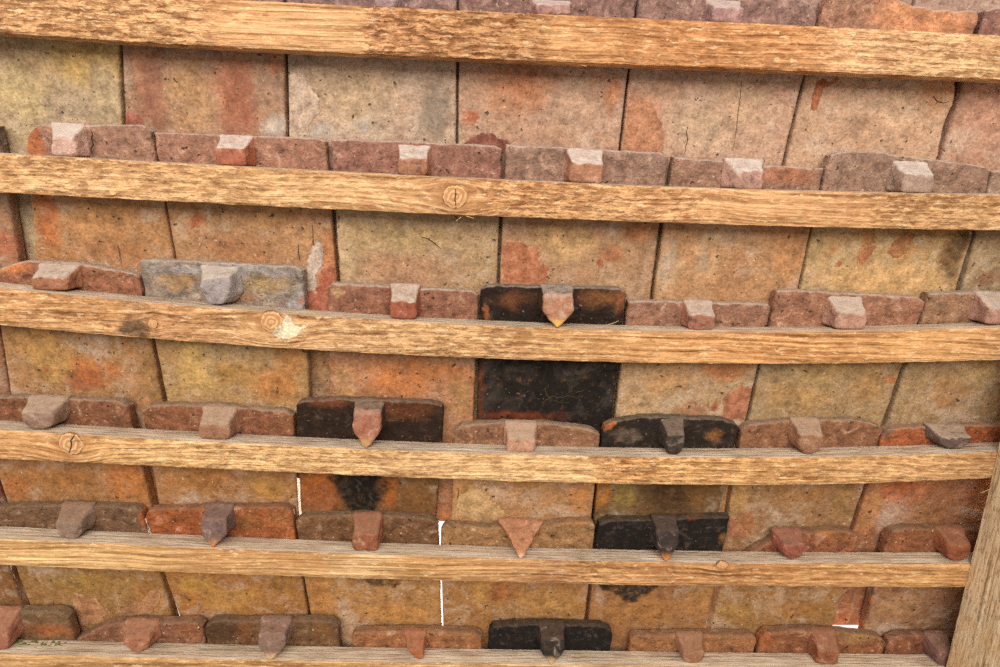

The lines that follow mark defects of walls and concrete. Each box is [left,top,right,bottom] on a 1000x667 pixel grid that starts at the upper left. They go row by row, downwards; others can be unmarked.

peeling [306,241,335,311]